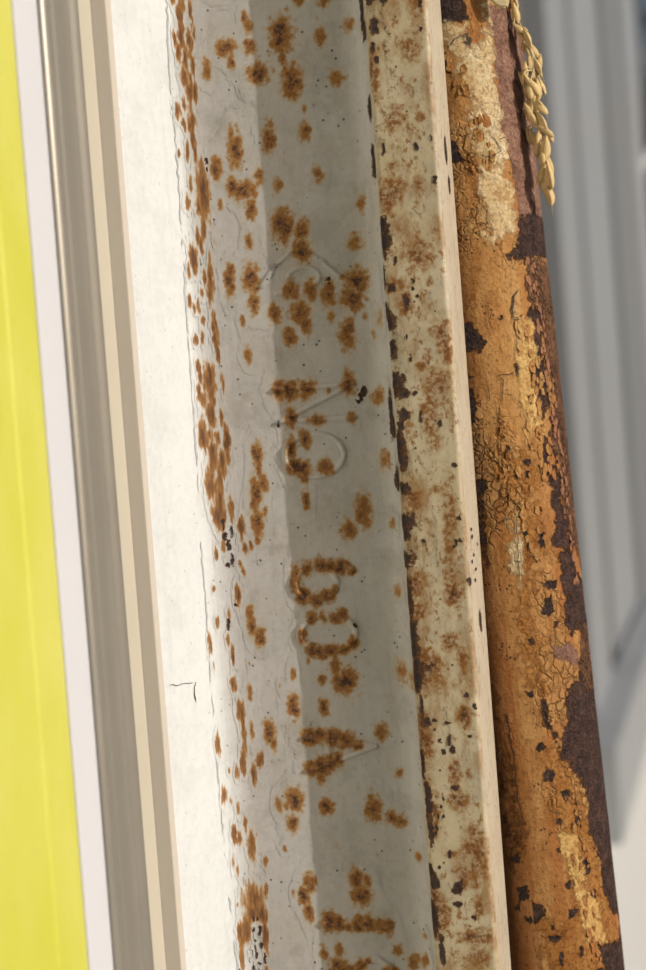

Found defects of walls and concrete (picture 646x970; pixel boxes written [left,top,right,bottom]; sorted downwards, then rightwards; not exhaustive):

corrosion [486,6,543,221]
corrosion [169,0,529,970]
peeling [440,0,587,637]
crack [502,516,537,579]
corrosion [514,495,552,697]
corrosion [525,256,581,566]
corrosion [552,616,595,692]
peeling [515,885,565,966]
peeling [525,671,625,970]
corrosion [535,746,621,970]